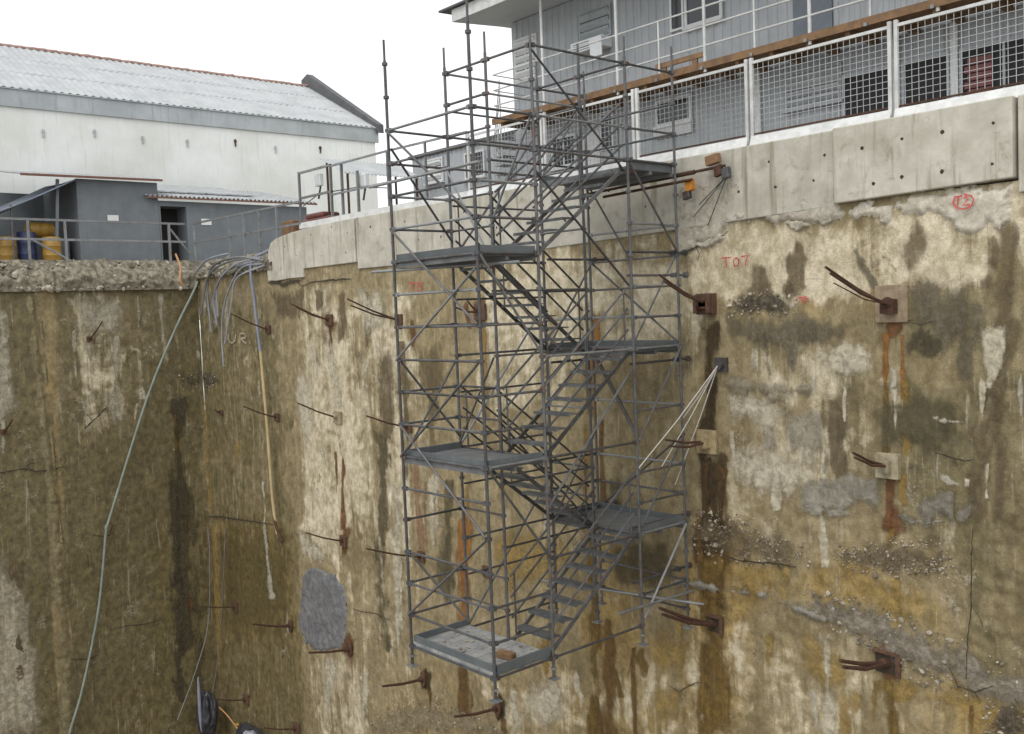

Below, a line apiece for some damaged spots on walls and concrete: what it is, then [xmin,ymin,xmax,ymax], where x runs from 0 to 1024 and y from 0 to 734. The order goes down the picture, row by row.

flaking render [672,180,1013,259]
spalling [726,289,797,319]
corrosion [698,321,720,430]
damp [726,243,871,511]
corrosion [882,322,909,410]
damp [874,369,955,451]
damp [905,222,1020,524]
damp [168,455,290,702]
corrosion [334,452,350,553]
corrosion [682,453,730,734]
spalling [832,476,971,581]
crack [949,530,993,702]